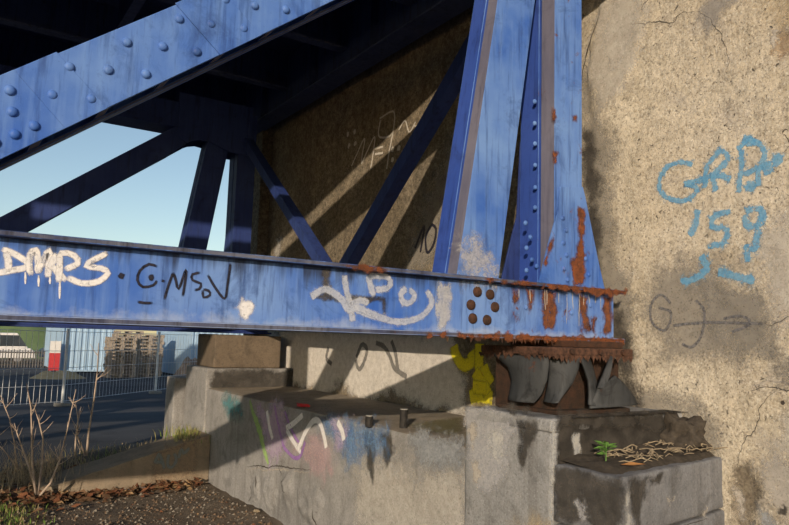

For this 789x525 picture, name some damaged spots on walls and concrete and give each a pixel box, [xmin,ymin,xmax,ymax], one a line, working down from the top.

crack [634,11,730,80]
rust [427,207,633,364]
crack [738,380,789,464]
crack [247,465,310,498]